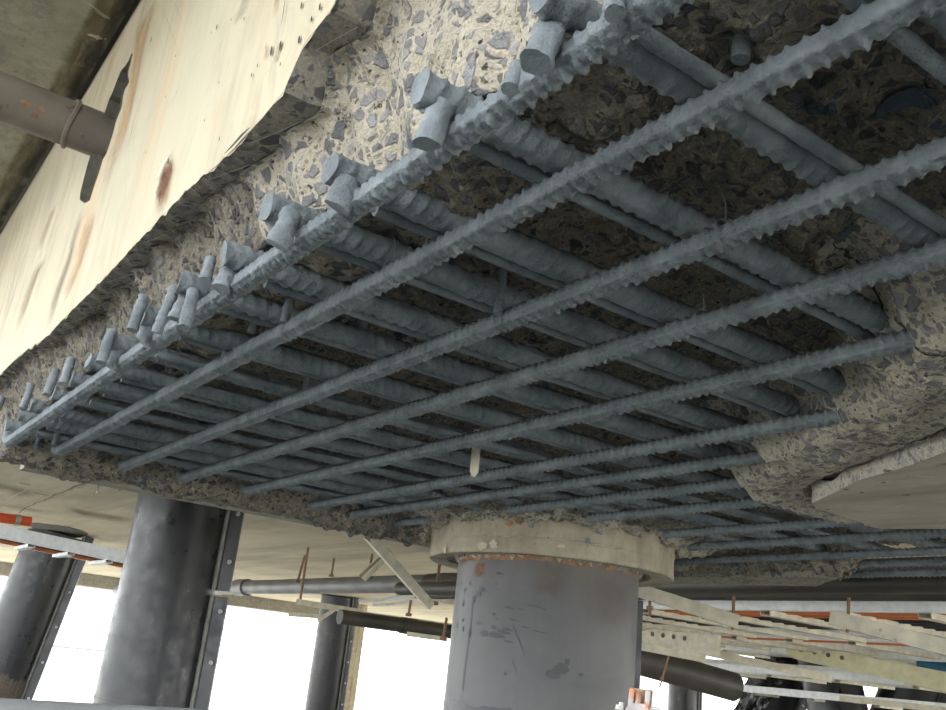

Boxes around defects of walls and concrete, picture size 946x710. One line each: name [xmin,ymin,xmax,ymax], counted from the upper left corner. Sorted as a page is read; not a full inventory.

rust [157,157,171,206]
spalling [0,0,946,566]
spalling [443,540,654,587]
spalling [674,558,865,581]
spalling [847,568,946,579]
spalling [858,557,946,568]